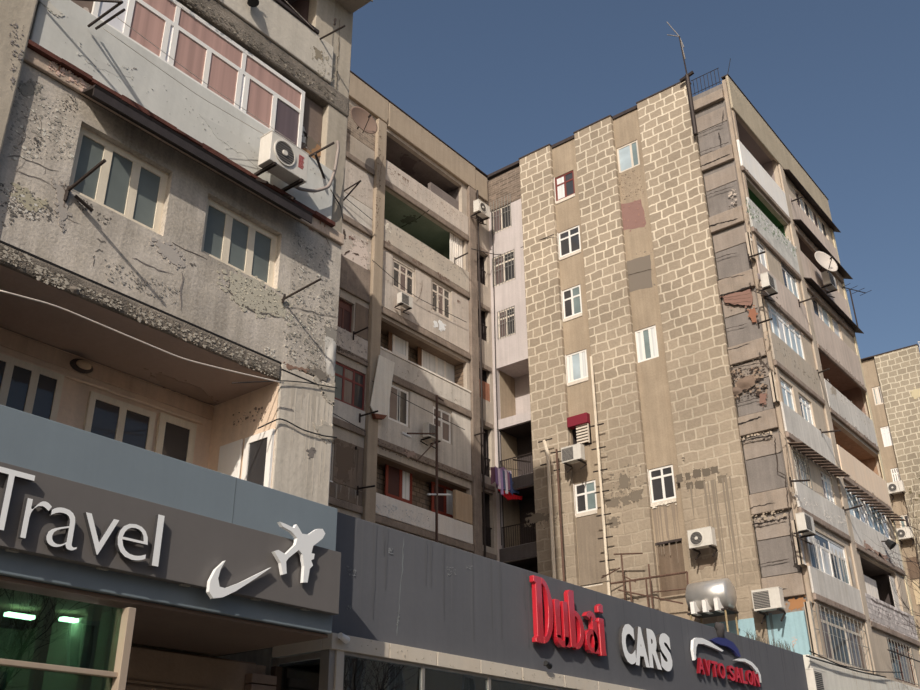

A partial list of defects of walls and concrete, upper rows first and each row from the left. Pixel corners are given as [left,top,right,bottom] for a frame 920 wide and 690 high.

spalling [0,182,53,226]
peeling [0,237,353,379]
spalling [730,349,768,407]